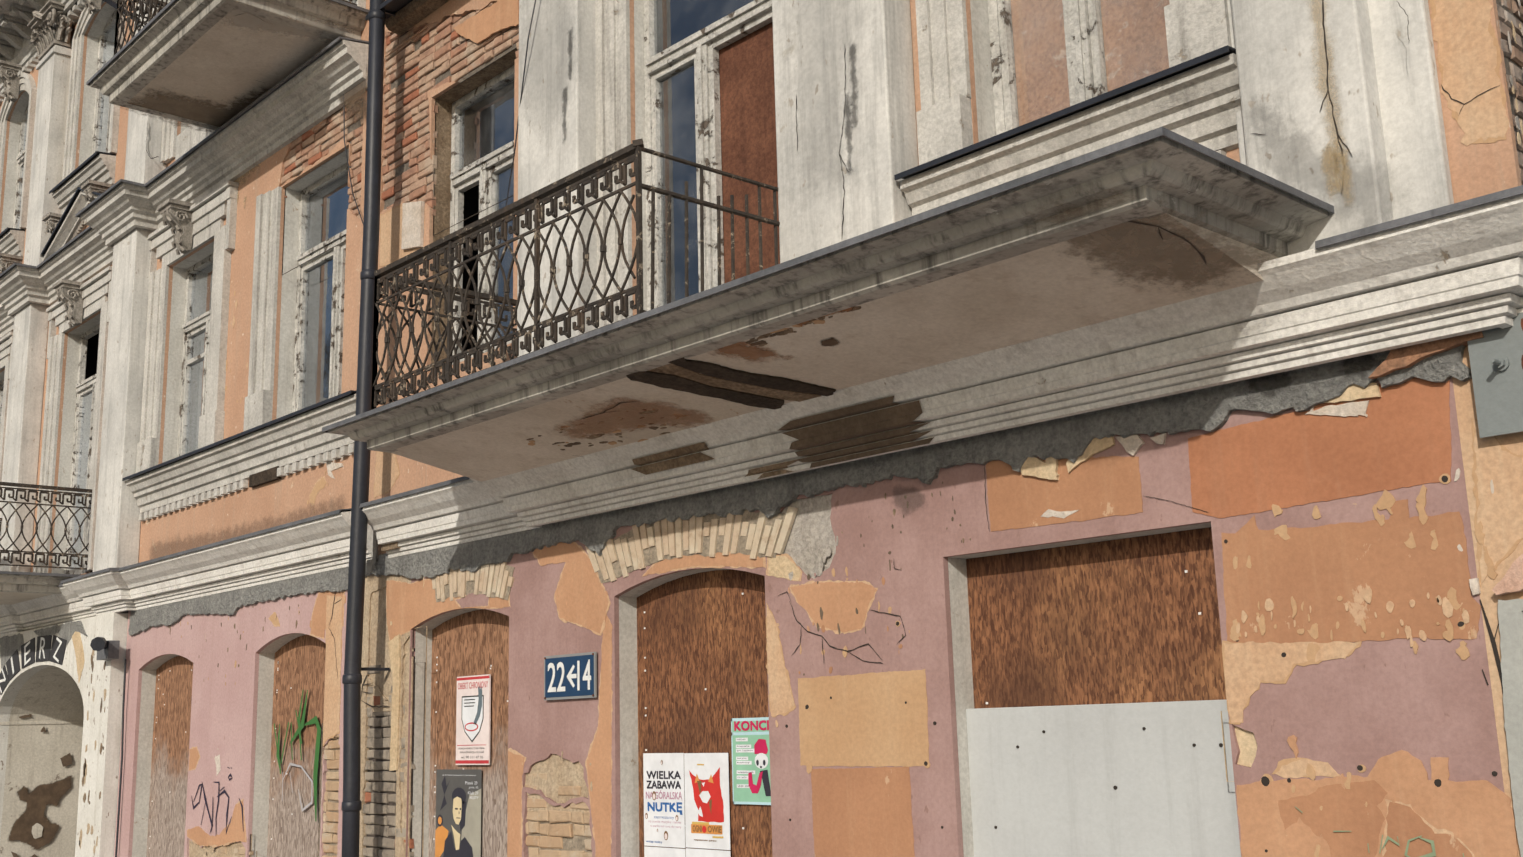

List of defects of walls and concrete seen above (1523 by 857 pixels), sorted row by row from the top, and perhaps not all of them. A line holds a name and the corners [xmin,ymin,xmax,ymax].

flaking render [281,107,364,275]
flaking render [379,0,519,267]
damp [1045,200,1267,285]
crack [1319,0,1352,194]
crack [1441,85,1500,114]
peeling [1429,0,1523,185]
peeling [527,410,714,475]
peeling [648,363,934,479]
spalling [1021,433,1167,480]
crack [778,592,906,664]
peeling [1220,419,1523,857]
peeling [11,823,43,857]